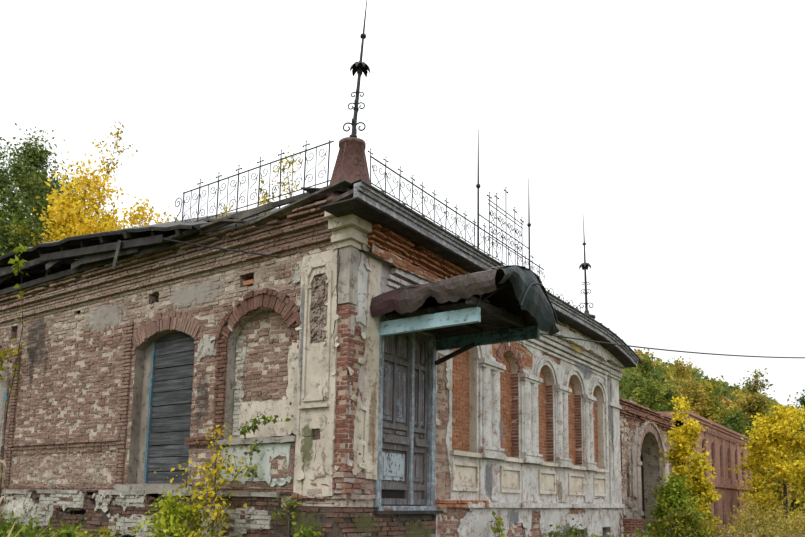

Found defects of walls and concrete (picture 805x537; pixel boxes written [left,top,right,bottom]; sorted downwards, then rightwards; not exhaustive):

spalling [220,243,447,500]
flaking render [491,341,532,370]
flaking render [399,353,491,537]
spalling [0,451,171,537]
peeling [195,504,272,537]
flaking render [505,498,542,537]
flaking render [567,508,587,517]